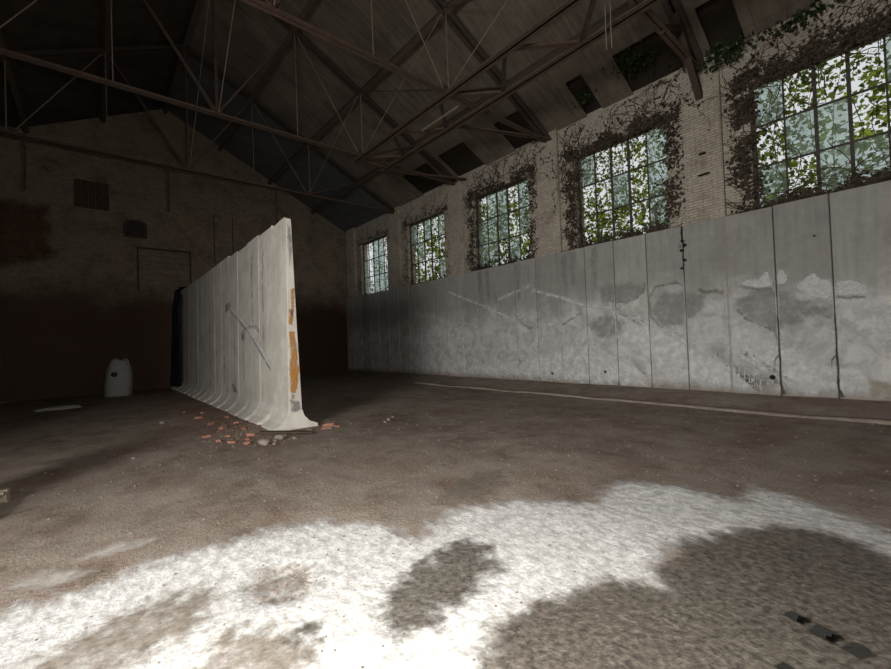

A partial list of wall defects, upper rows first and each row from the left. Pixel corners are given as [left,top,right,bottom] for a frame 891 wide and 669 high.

rust [289,288,299,393]
leakage [438,268,855,394]